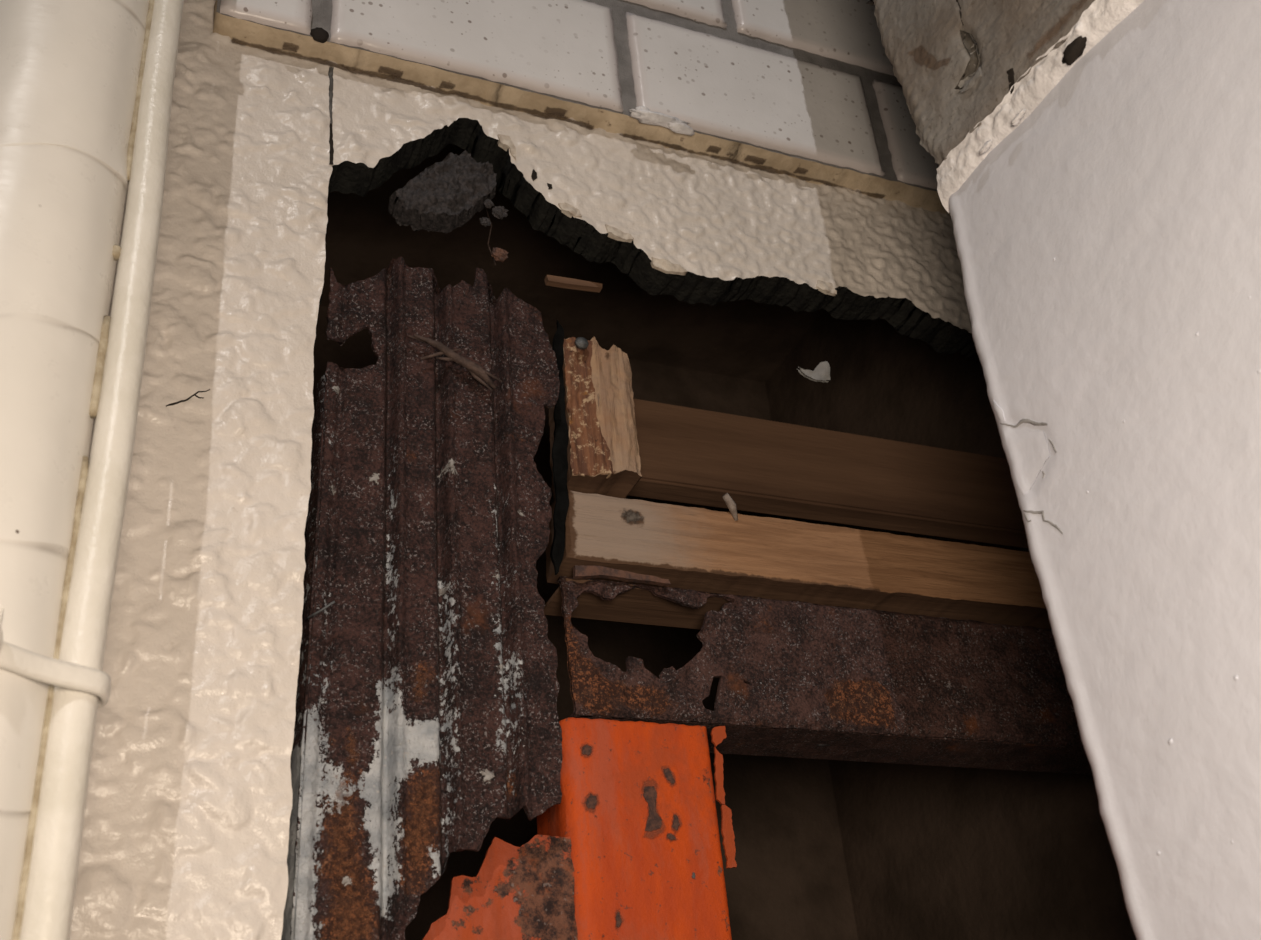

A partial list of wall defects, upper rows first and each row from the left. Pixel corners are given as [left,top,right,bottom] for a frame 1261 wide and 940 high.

spalling [328,118,980,360]
peeling [563,337,613,478]
peeling [993,400,1050,495]
crack [1000,419,1057,478]
crack [1023,510,1063,533]
corrosion [573,565,671,587]
corrosion [580,744,593,757]
corrosion [583,793,599,817]
corrosion [642,766,682,841]
peeling [711,726,737,869]